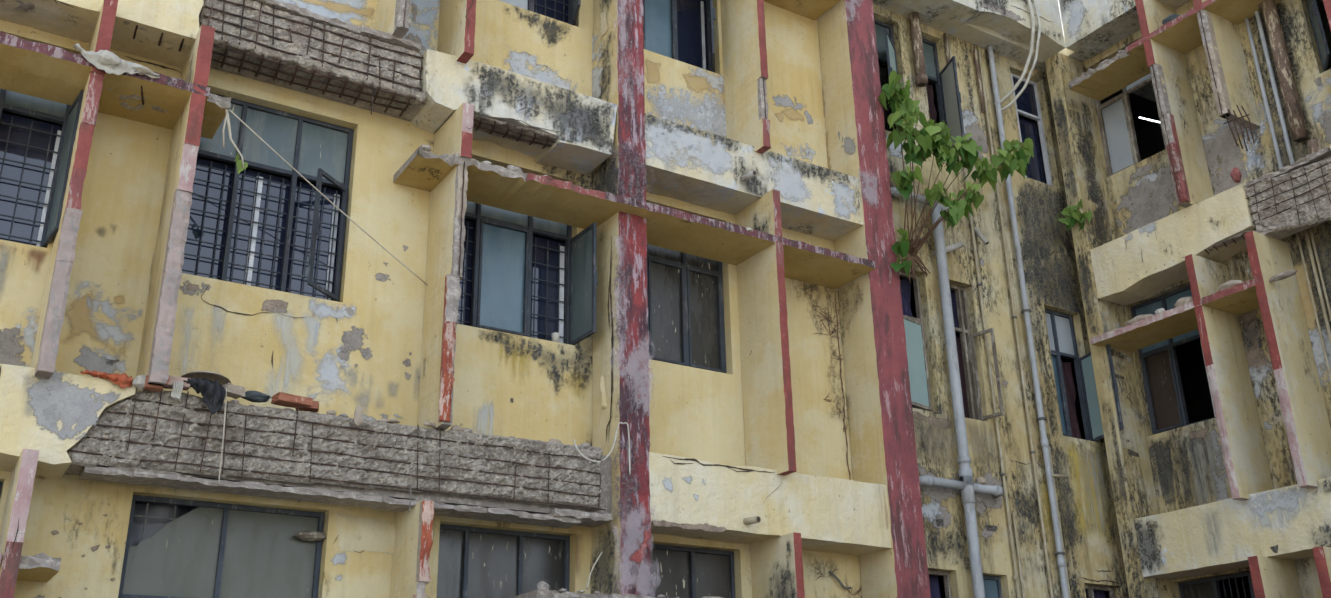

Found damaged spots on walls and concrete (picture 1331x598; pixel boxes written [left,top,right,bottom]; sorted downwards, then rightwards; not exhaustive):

spalling [123,21,186,52]
spalling [200,0,440,117]
water stain [470,35,652,195]
peeling [473,0,733,174]
peeling [769,132,905,218]
flaking render [1116,64,1191,241]
spalling [1197,9,1331,254]
spalling [0,161,726,596]
water stain [1013,72,1220,598]
water stain [1288,221,1331,383]
water stain [923,516,970,569]